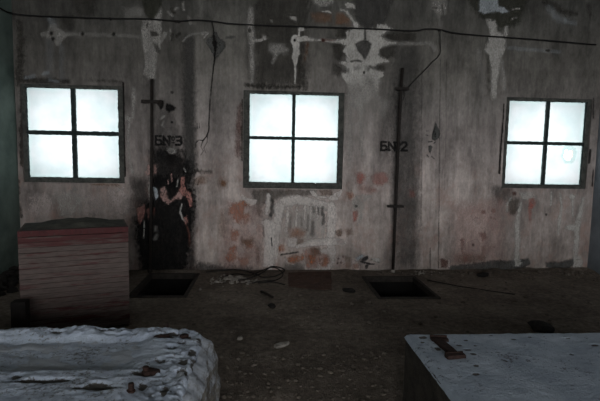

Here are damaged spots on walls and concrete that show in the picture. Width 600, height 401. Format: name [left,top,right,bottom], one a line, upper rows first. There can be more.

damp [142,0,161,75]
damp [246,0,347,89]
damp [355,0,393,58]
damp [470,0,526,98]
peeling [148,174,192,244]
peeling [226,201,256,263]